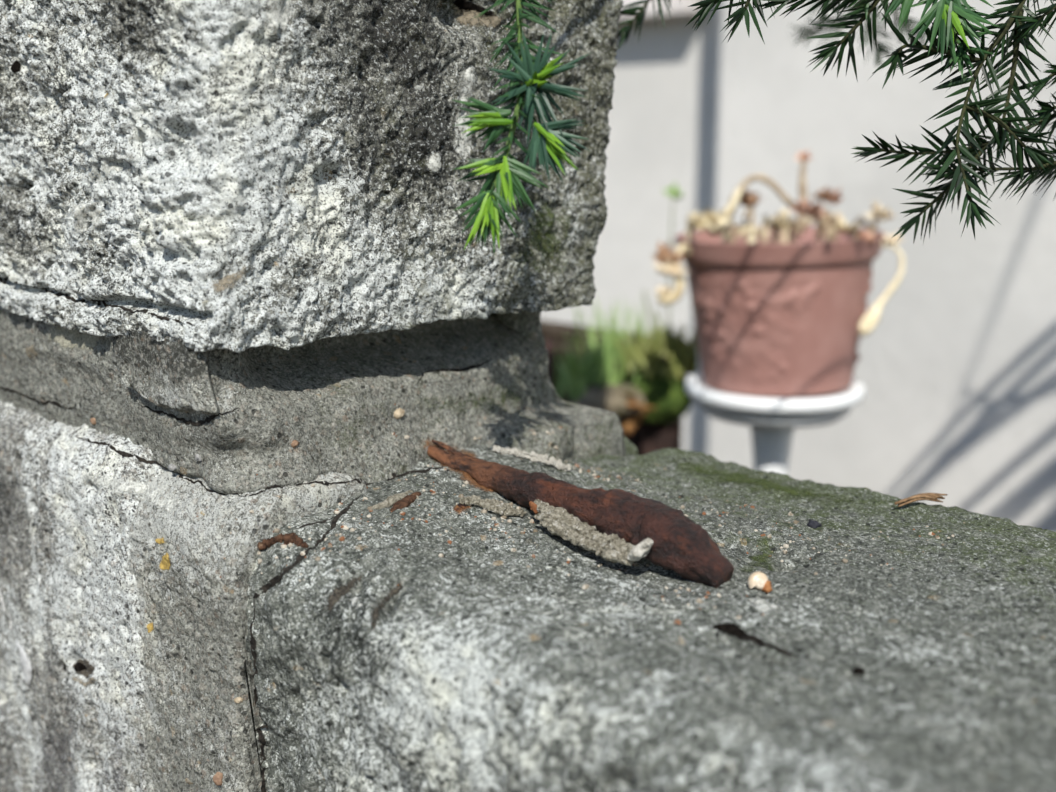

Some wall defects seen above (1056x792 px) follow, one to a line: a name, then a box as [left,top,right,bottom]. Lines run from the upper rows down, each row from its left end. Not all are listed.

crack [0,277,195,326]
crack [0,387,75,409]
crack [138,403,238,426]
crack [75,436,445,792]